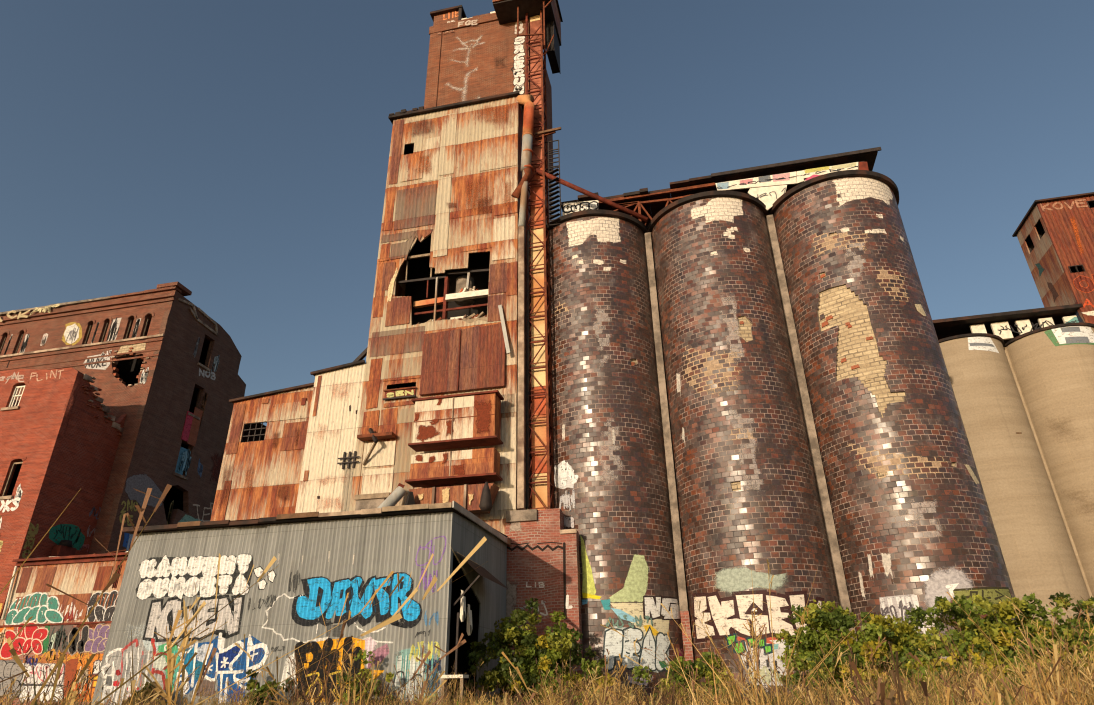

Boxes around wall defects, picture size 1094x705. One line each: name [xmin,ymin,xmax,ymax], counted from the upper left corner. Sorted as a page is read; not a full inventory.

rust [412,120,432,135]
rust [449,181,488,212]
peeling [387,268,398,302]
spalling [733,316,752,342]
spalling [818,272,905,418]
spalling [112,343,150,388]
spalling [82,374,124,436]